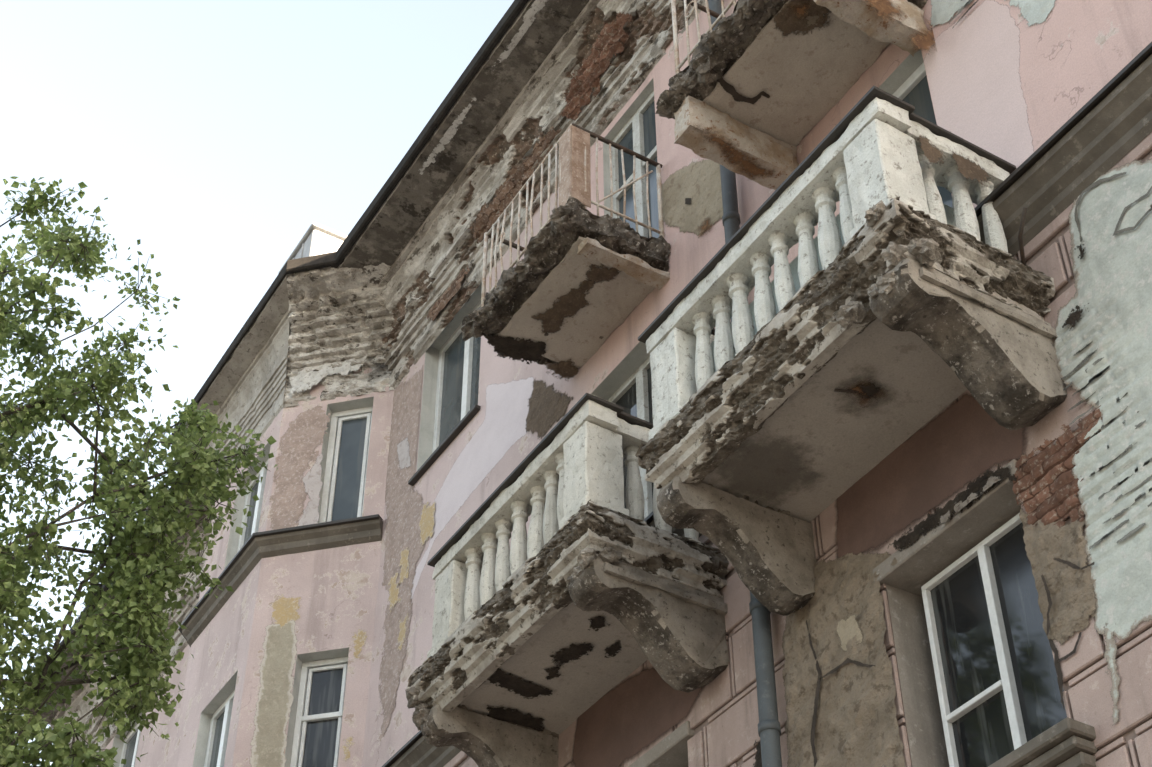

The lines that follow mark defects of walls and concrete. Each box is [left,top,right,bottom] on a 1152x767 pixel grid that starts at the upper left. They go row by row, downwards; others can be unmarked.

flaking render [469,0,632,247]
spalling [655,0,780,119]
crack [710,69,770,104]
spalling [662,159,723,238]
spalling [461,205,578,341]
spalling [531,263,620,333]
peeling [288,355,367,394]
peeling [269,406,331,530]
peeling [782,159,1152,767]
flaking render [250,594,302,767]
spalling [487,616,622,731]
flaking render [572,667,703,767]